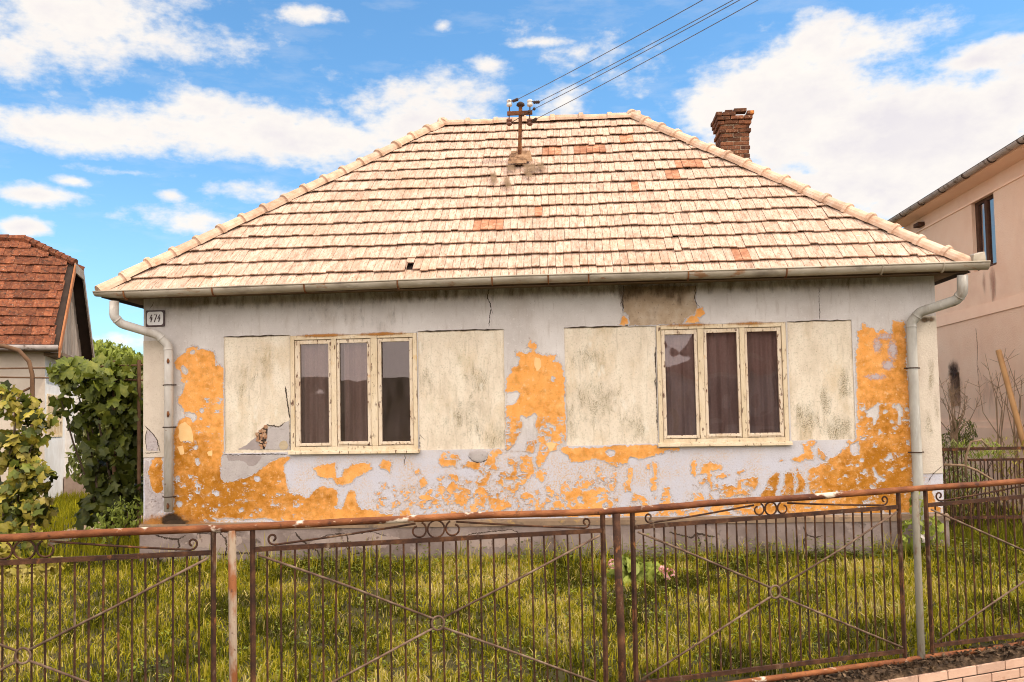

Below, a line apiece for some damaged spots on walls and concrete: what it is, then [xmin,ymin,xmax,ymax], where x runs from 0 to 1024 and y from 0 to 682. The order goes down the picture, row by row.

crack [418,290,499,332]
peeling [618,284,706,327]
peeling [143,319,913,551]